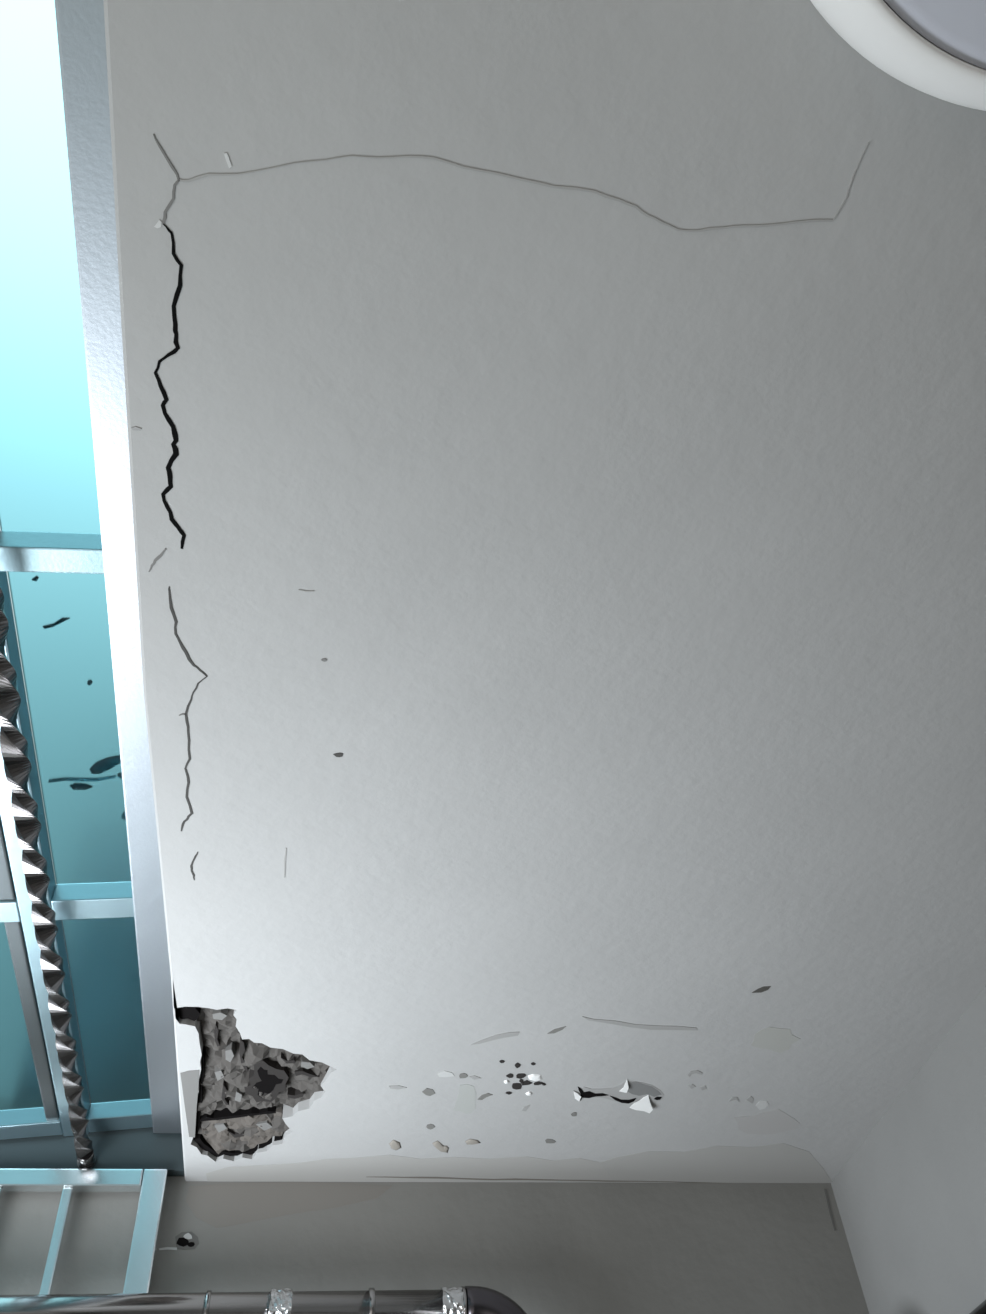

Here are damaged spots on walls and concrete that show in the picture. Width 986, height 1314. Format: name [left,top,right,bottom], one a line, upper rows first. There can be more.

crack [148,134,869,880]
spalling [177,1007,330,1157]
spalling [437,1060,546,1111]
peeling [571,1080,664,1116]